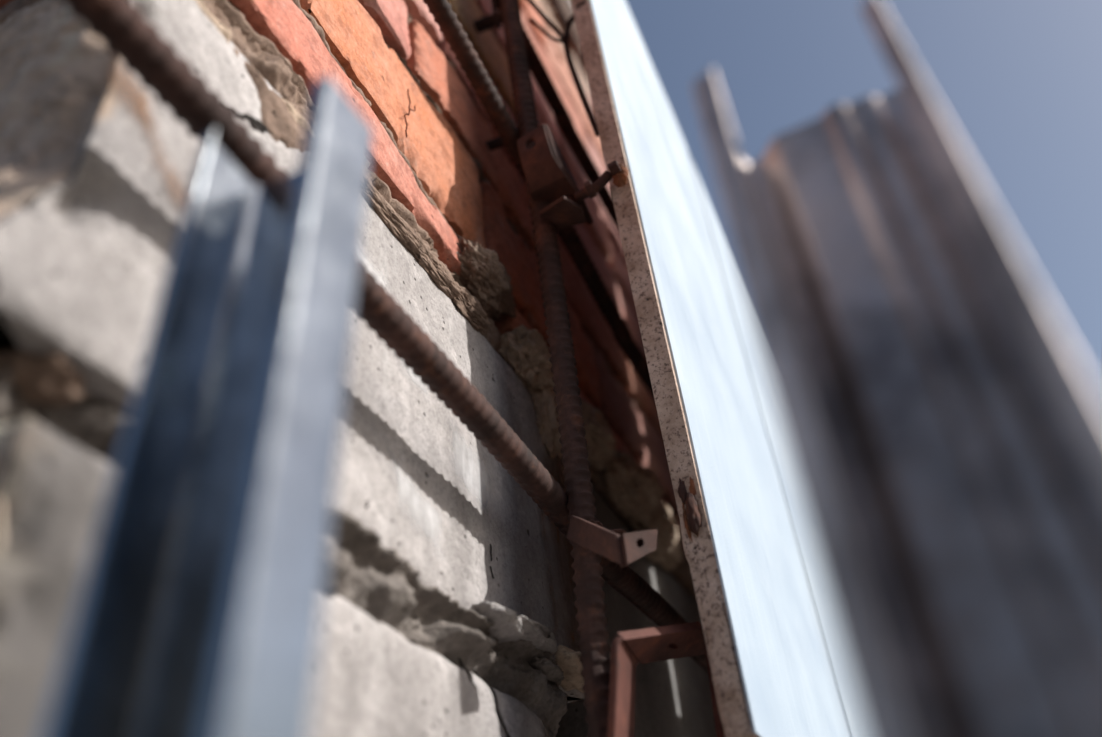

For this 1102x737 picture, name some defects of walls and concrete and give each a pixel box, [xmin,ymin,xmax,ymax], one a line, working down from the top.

spalling [62,0,307,194]
crack [404,89,416,137]
spalling [0,349,129,466]
spalling [324,0,688,737]
rust [682,477,696,544]